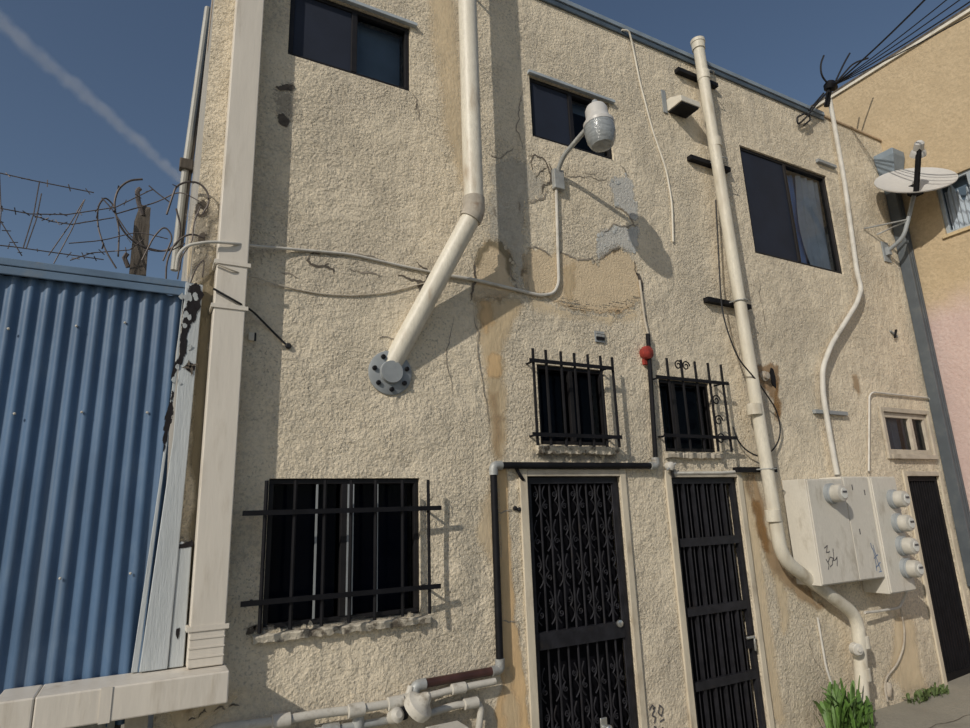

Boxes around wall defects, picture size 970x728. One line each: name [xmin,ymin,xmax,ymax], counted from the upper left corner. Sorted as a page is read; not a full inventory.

crack [491,88,630,181]
crack [281,252,430,290]
peeling [470,157,643,314]
crack [446,308,490,445]